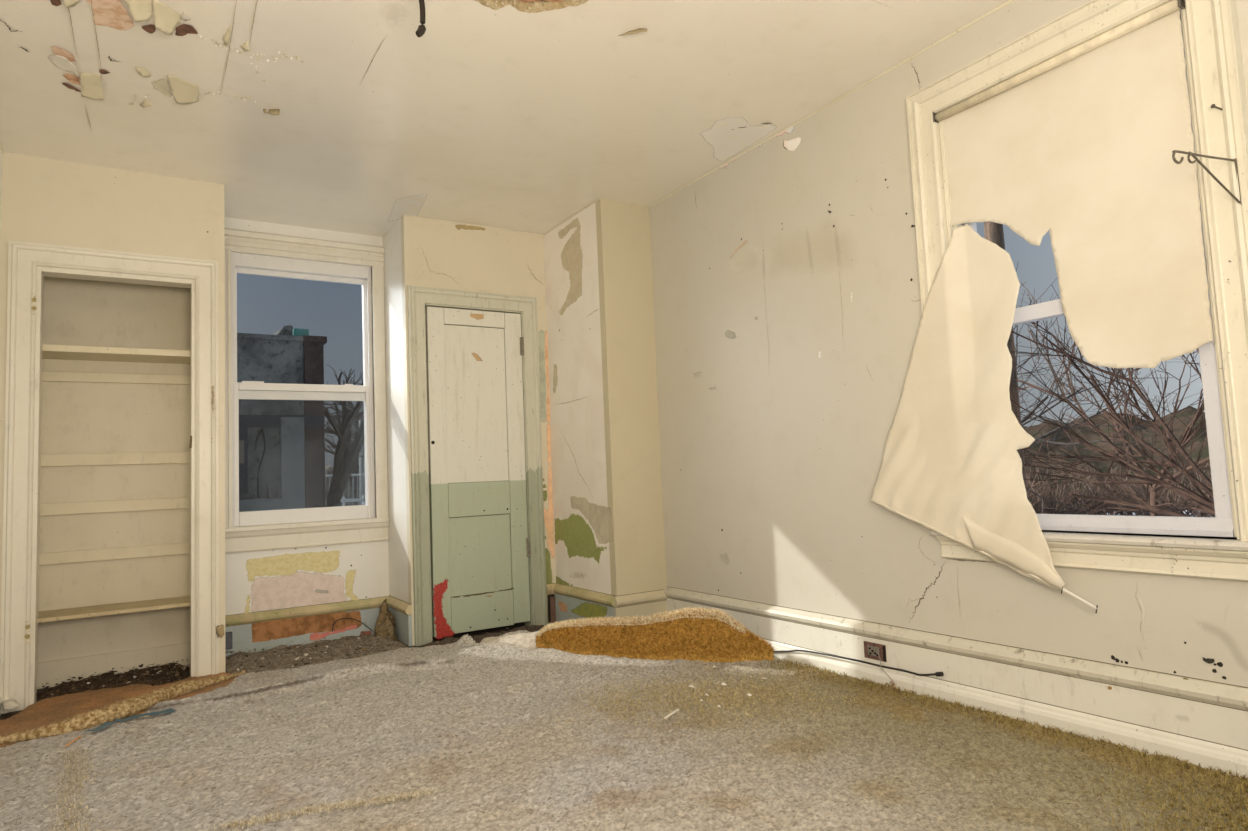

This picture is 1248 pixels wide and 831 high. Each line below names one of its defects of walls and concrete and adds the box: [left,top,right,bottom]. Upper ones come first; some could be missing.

peeling [47,46,120,100]
peeling [50,0,308,82]
peeling [129,67,280,115]
flaking render [776,126,801,151]
peeling [558,218,582,315]
peeling [539,330,613,587]
peeling [245,551,371,643]
peeling [433,579,514,640]
peeling [558,602,607,619]
crack [906,535,946,620]